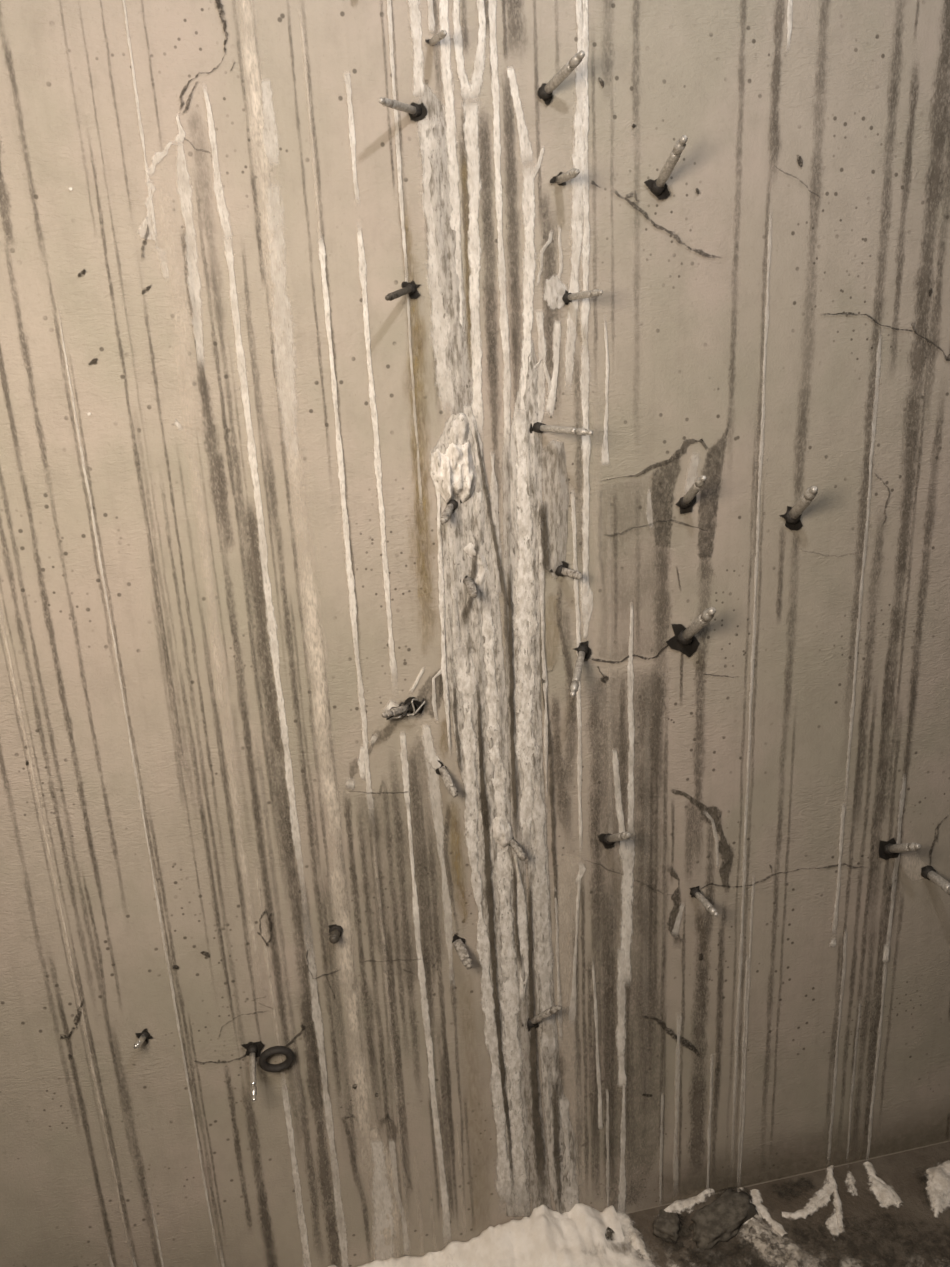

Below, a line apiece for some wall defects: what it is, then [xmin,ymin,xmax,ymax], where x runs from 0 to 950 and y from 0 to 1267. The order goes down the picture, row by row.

leakage [0,170,12,238]
leakage [94,175,113,296]
crack [591,181,714,257]
leakage [0,348,17,445]
crack [825,312,950,361]
leakage [80,448,101,572]
leakage [32,534,74,750]
leakage [177,0,457,1267]
leakage [408,0,667,1217]
crack [592,644,668,677]
leakage [680,0,950,1200]
leakage [5,640,107,1074]